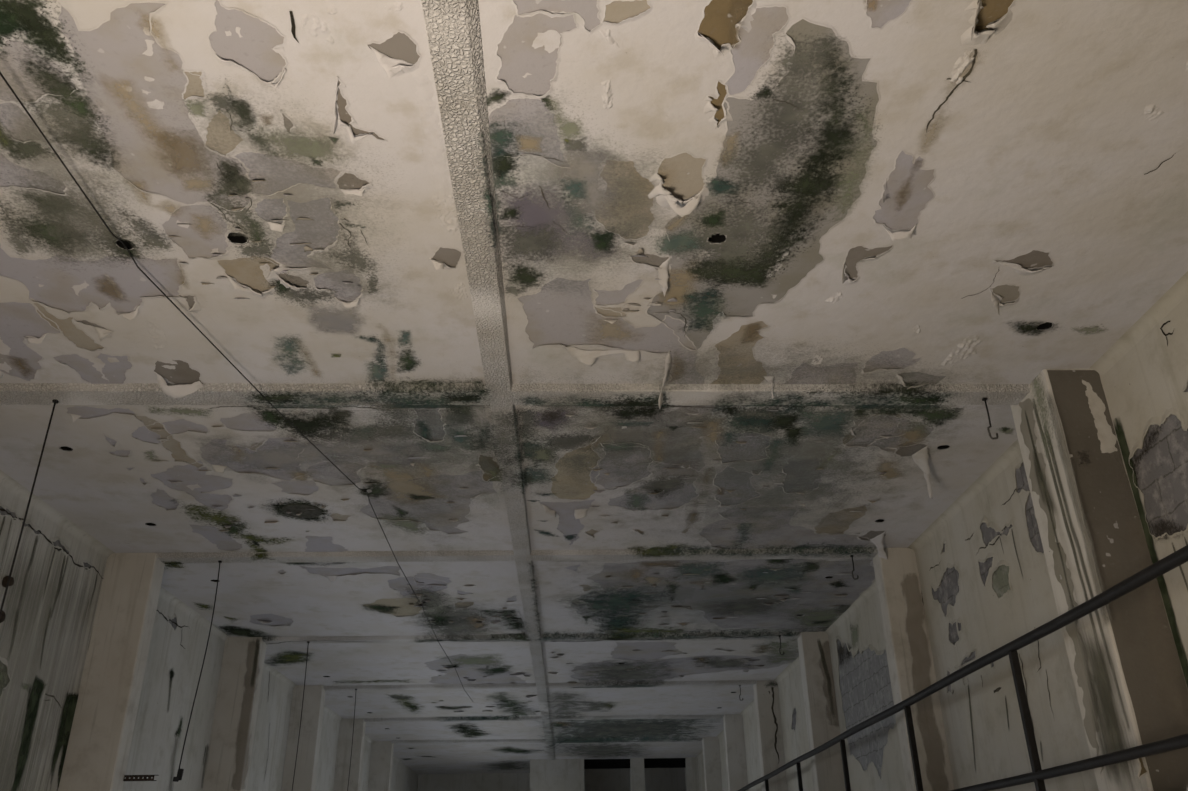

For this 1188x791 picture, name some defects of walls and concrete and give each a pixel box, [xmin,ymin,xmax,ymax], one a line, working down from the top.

leakage [0,0,116,168]
peeling [0,0,365,385]
leakage [482,96,613,296]
peeling [488,0,653,169]
peeling [516,0,935,546]
leakage [657,39,873,330]
crack [926,49,977,132]
leakage [213,281,669,533]
crack [0,508,104,579]
leakage [409,543,874,702]
peeling [548,493,897,781]
peeling [1046,369,1188,791]